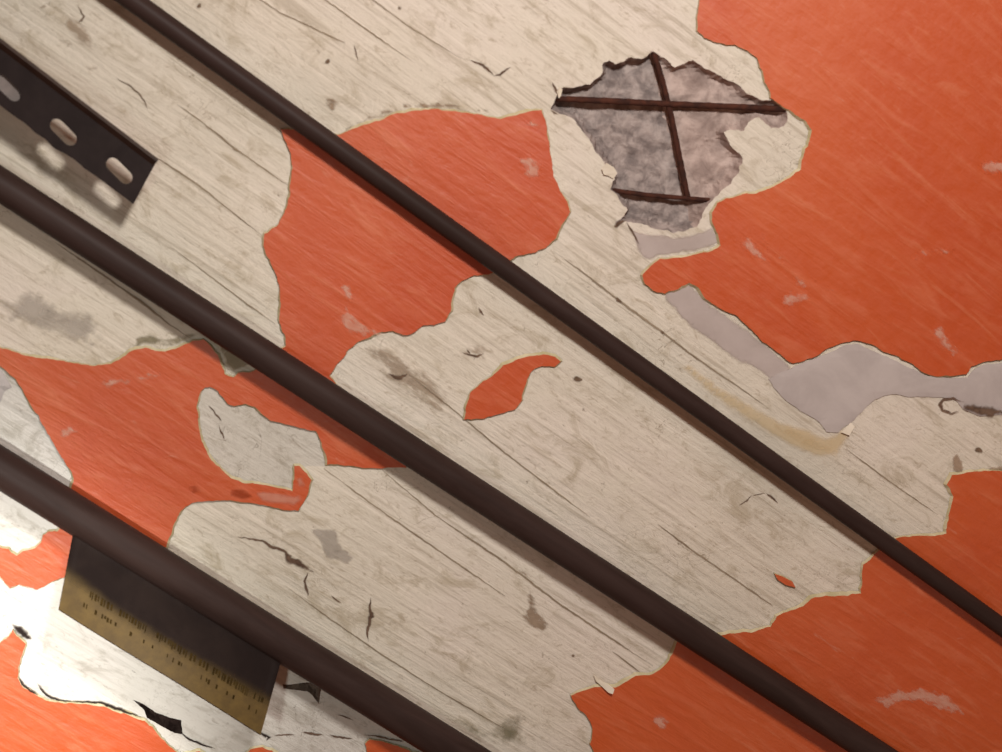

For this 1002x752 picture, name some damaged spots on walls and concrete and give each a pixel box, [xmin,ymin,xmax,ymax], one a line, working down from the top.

peeling [0,0,293,348]
peeling [0,204,256,377]
peeling [151,0,1002,539]
peeling [0,492,60,556]
peeling [0,366,74,488]
crack [240,537,341,603]
peeling [166,387,677,752]
peeling [330,273,879,635]
peeling [0,577,422,752]